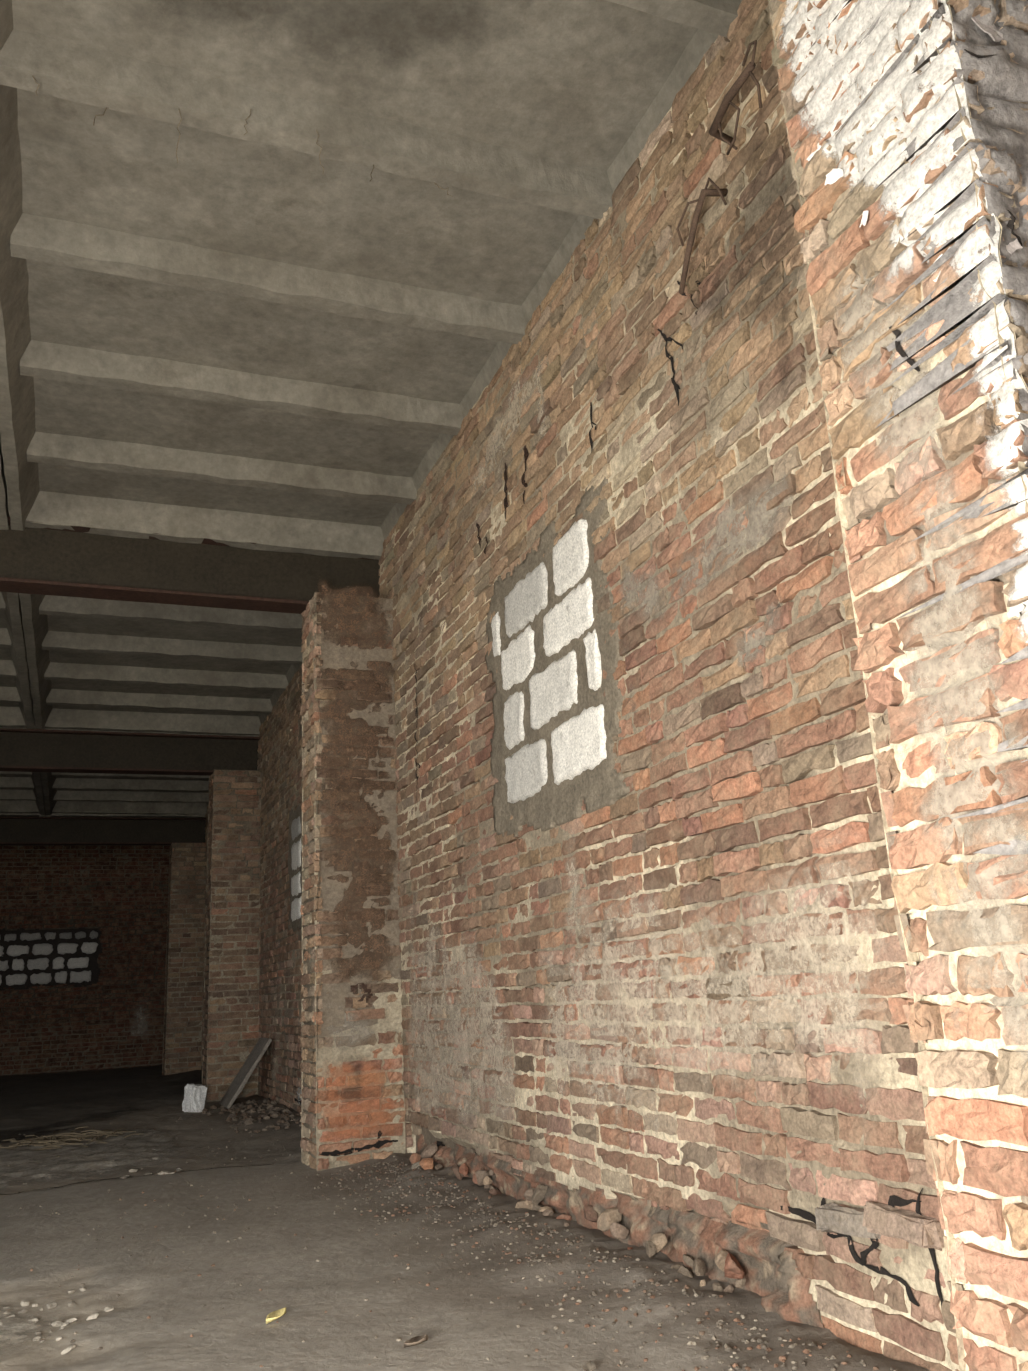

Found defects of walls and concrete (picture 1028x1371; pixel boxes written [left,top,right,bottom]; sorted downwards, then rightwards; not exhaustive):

peeling [779,0,1028,664]
crack [588,402,596,452]
peeling [996,731,1028,763]
spalling [316,583,399,1011]
peeling [951,797,1028,819]
peeling [974,832,1028,855]
crack [888,1188,923,1215]
crack [780,1198,943,1307]